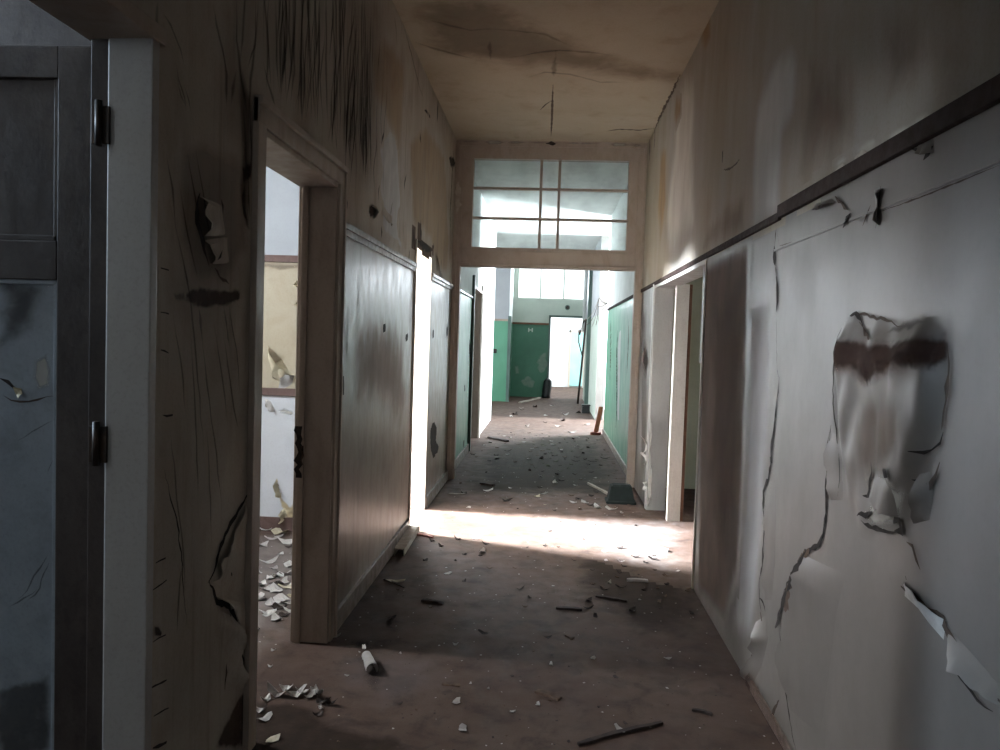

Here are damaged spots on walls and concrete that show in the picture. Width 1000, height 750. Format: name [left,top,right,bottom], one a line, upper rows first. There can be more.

crack [540,90,554,133]
peeling [812,196,851,228]
peeling [195,193,230,284]
peeling [268,350,294,388]
spalling [293,426,304,478]
spalling [430,422,439,458]
peeling [901,583,1000,712]